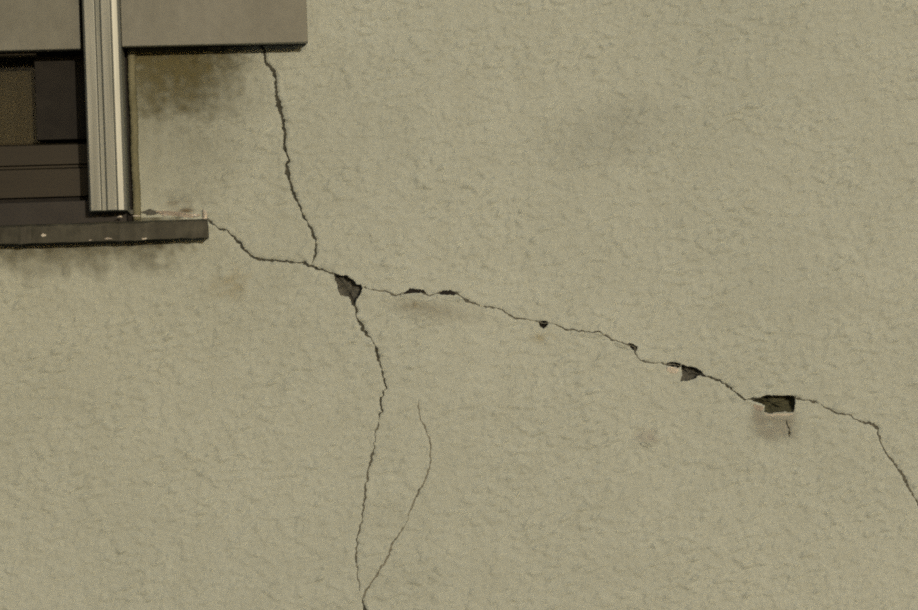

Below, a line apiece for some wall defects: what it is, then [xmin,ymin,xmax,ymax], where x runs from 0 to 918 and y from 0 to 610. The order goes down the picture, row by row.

crack [208,46,336,276]
spalling [334,274,362,305]
crack [352,286,760,610]
spalling [666,362,702,381]
spalling [751,395,795,437]
crack [795,397,918,505]